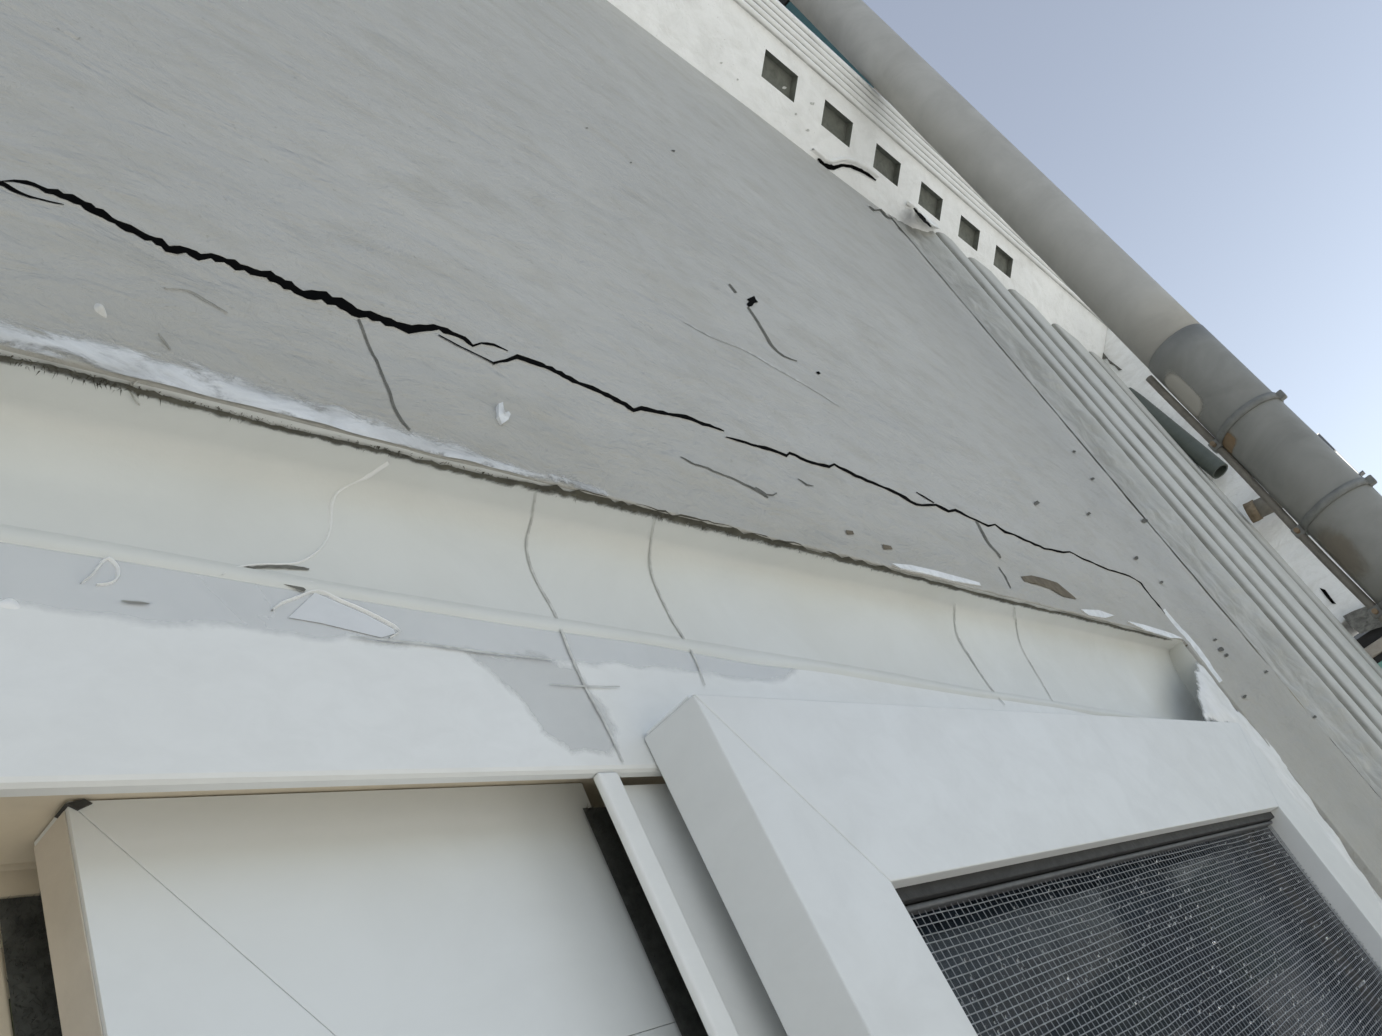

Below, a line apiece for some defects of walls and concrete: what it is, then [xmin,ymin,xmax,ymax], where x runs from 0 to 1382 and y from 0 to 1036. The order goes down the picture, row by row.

peeling [0,322,608,496]
peeling [223,461,401,639]
crack [350,490,624,762]
crack [0,179,1165,704]